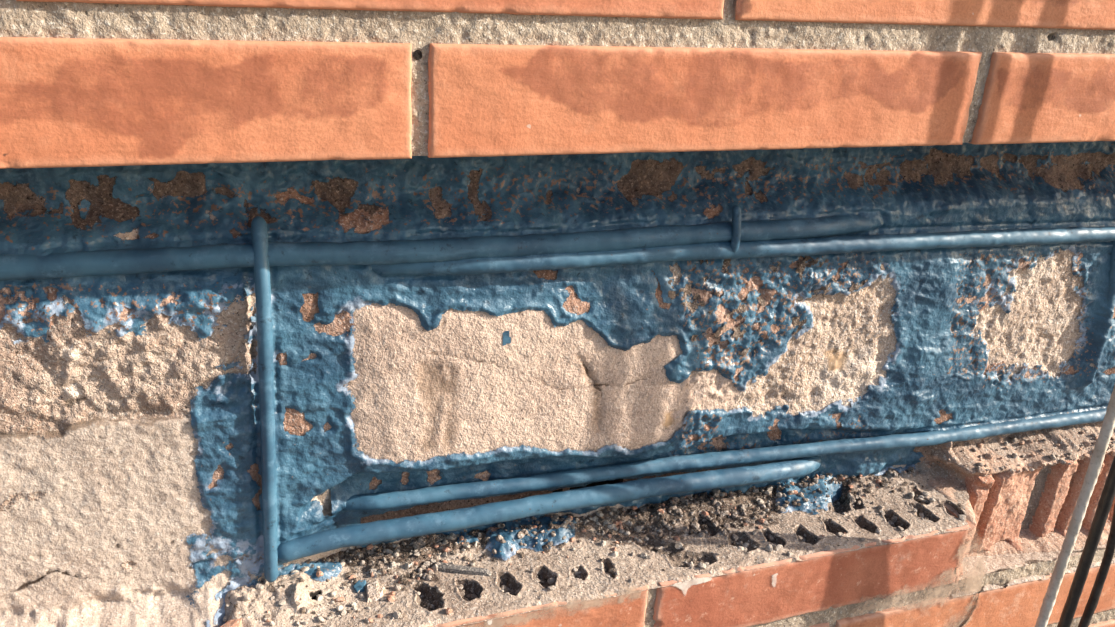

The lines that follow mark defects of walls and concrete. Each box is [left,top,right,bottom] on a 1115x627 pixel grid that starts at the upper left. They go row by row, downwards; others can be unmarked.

peeling [0,168,1115,596]
crack [17,570,94,591]
crack [960,569,1009,627]